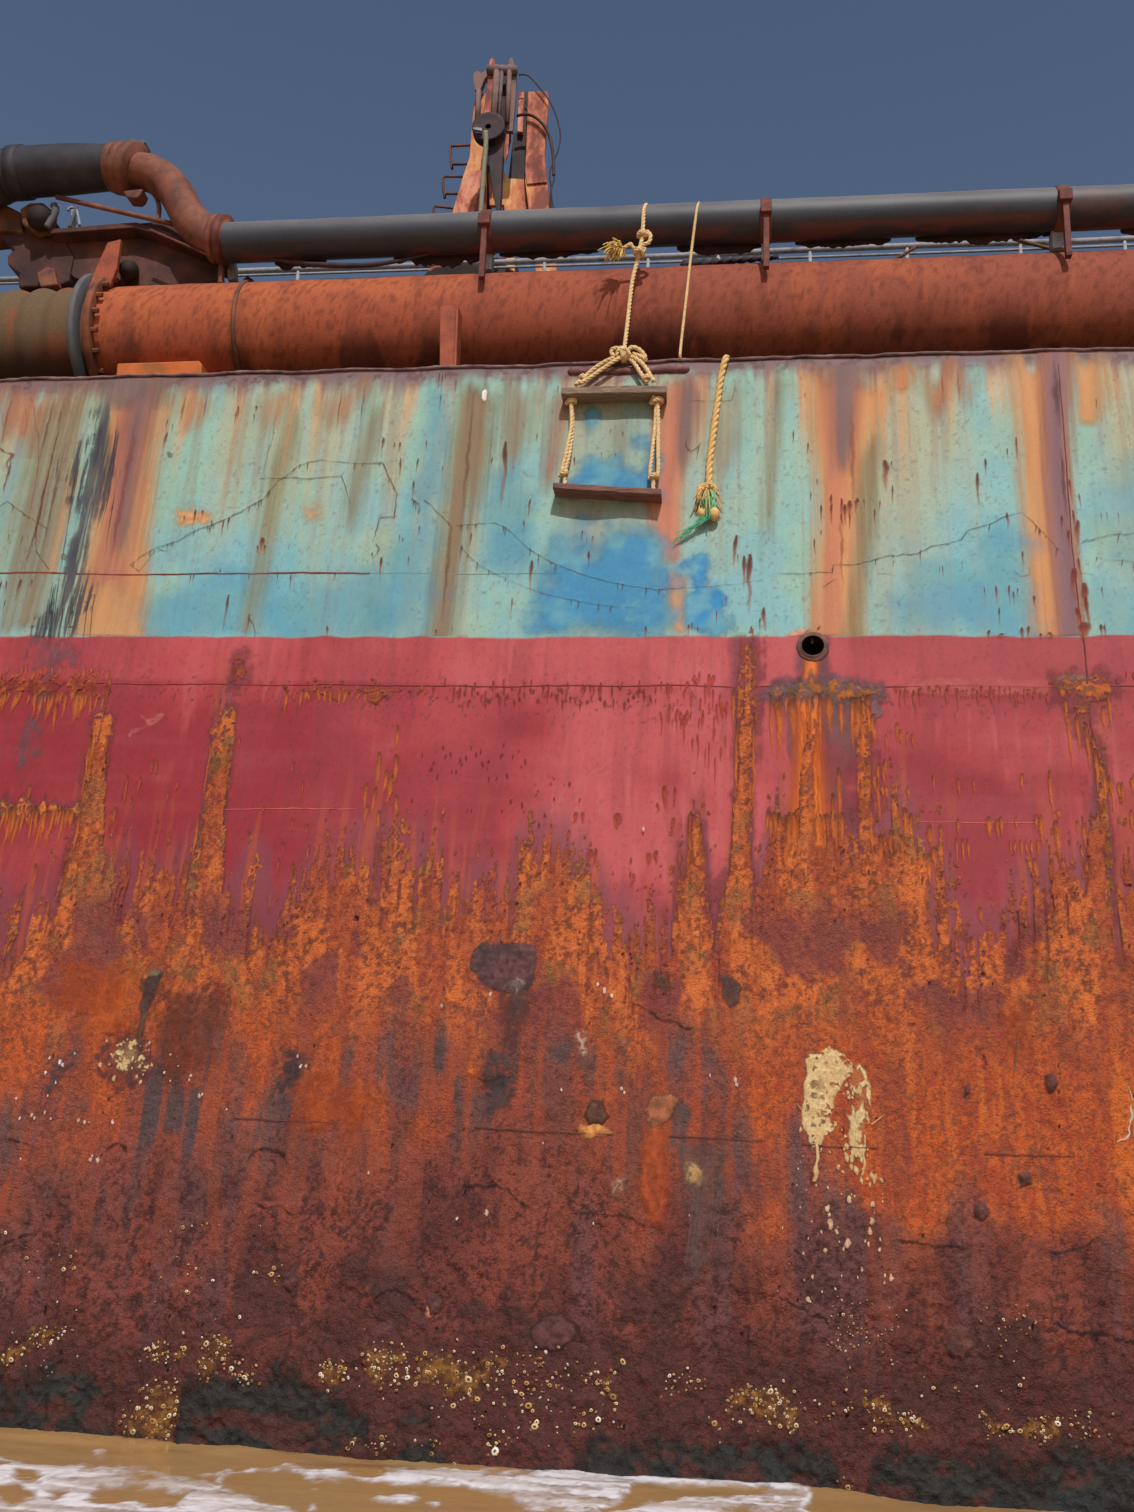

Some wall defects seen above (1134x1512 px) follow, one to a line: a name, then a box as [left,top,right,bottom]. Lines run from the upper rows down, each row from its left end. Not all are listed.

rust [0,381,83,625]
rust [80,379,206,635]
rust [177,509,230,531]
rust [245,457,281,629]
rust [366,416,427,491]
rust [429,387,507,636]
rust [648,379,705,633]
rust [733,535,752,593]
rust [793,365,915,635]
rust [984,351,1109,638]
rust [0,607,1134,1493]
peeling [789,1064,883,1264]